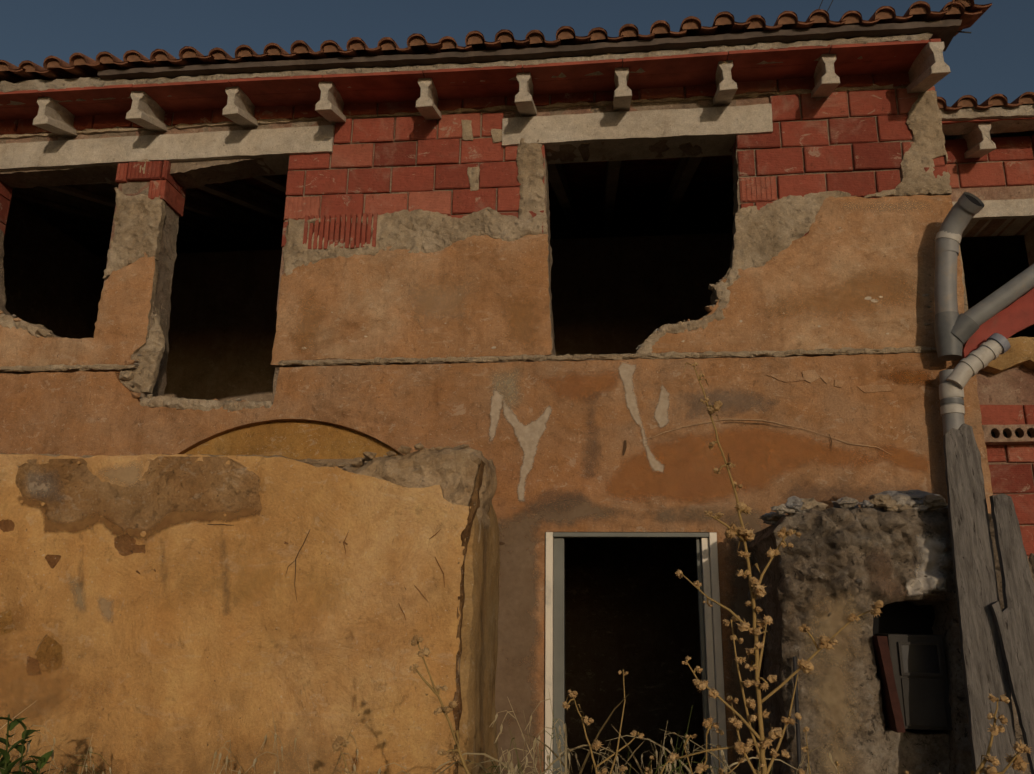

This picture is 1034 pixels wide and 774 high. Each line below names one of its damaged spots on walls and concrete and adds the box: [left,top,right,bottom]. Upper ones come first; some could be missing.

spalling [635,262,741,359]